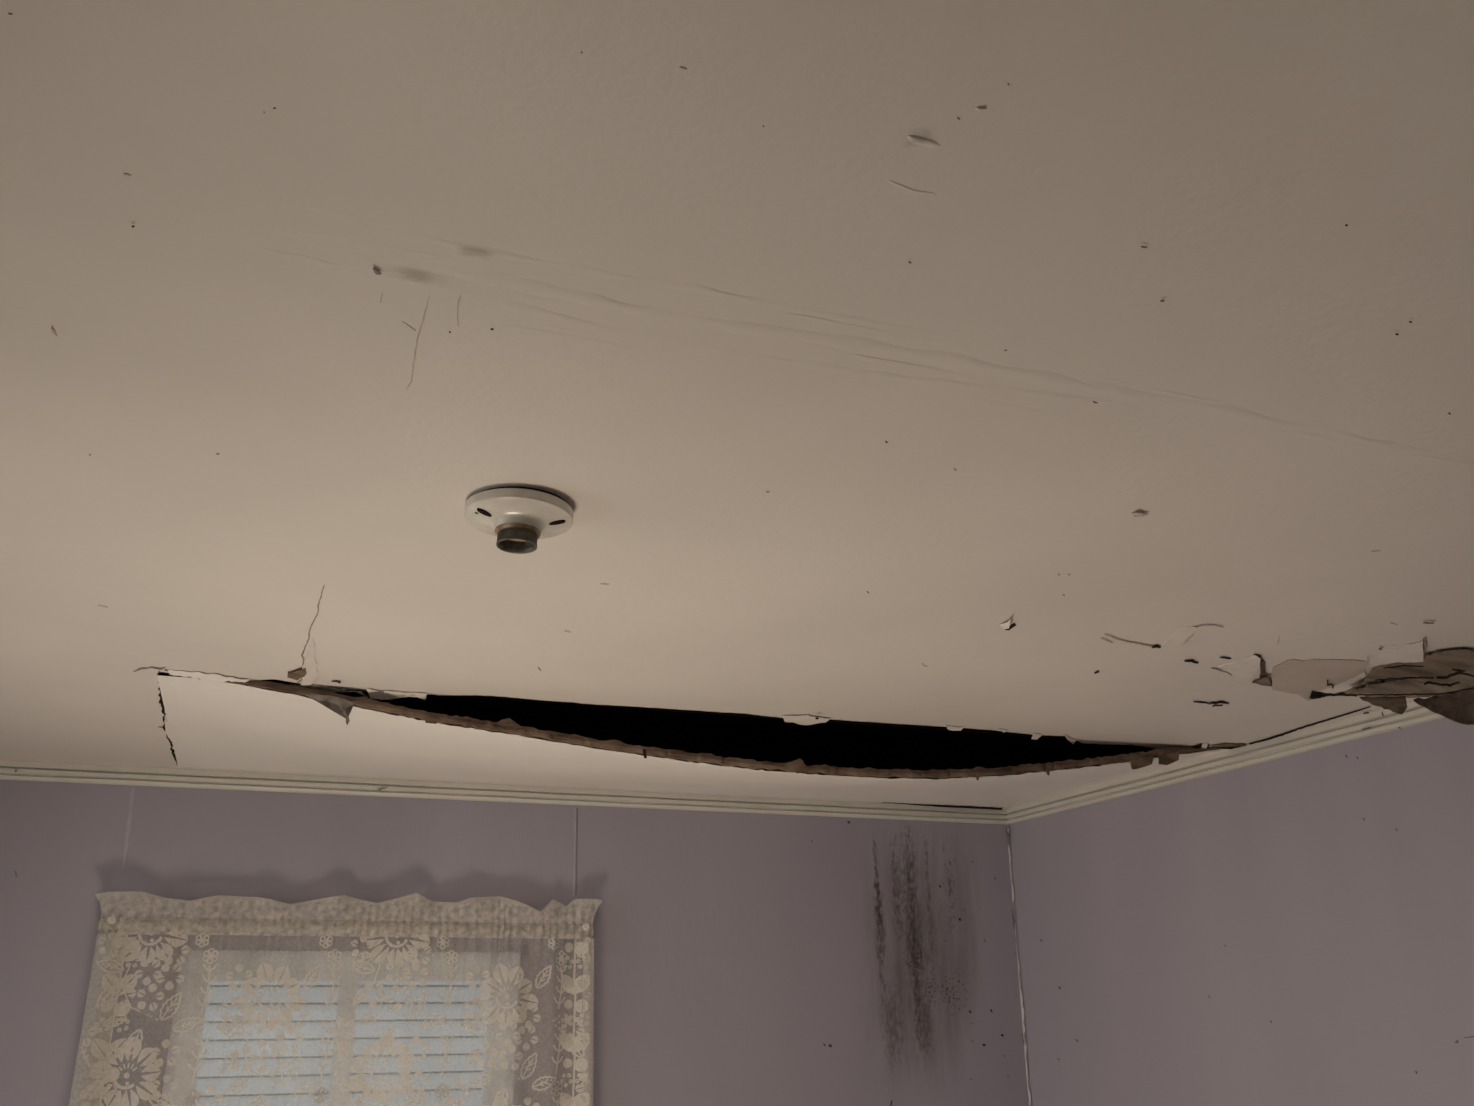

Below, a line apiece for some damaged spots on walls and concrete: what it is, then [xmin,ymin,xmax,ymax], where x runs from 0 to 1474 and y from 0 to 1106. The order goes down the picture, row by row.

crack [133,666,249,765]
crack [287,585,325,685]
peeling [1101,622,1474,730]